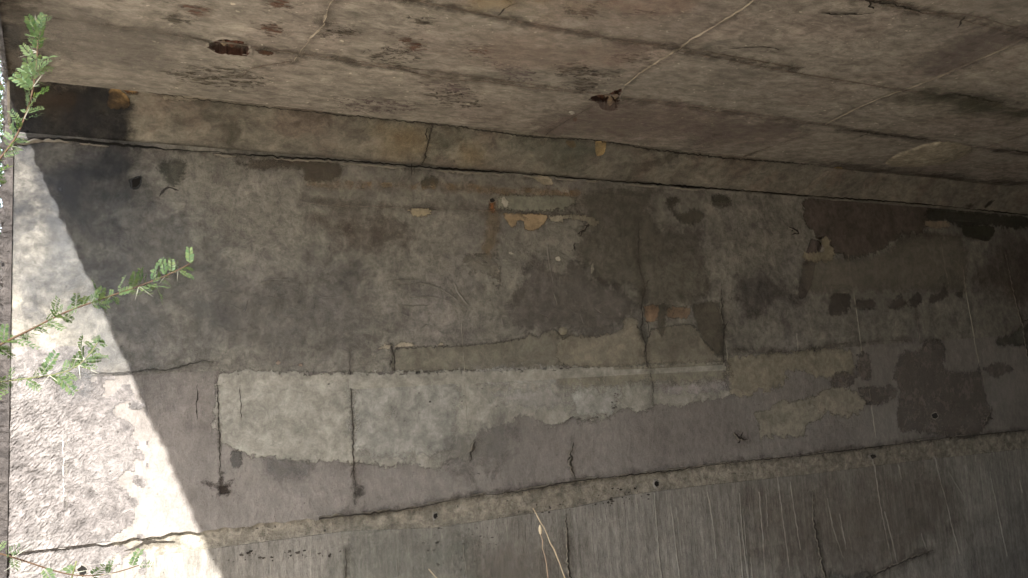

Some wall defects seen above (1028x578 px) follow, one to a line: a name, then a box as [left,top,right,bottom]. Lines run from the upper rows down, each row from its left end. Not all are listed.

spalling [0,16,148,578]
peeling [211,304,867,471]
peeling [498,175,599,231]
crack [637,222,654,401]
crack [319,356,1026,520]
water stain [735,198,1028,317]
crack [564,514,572,578]
crack [812,494,827,578]